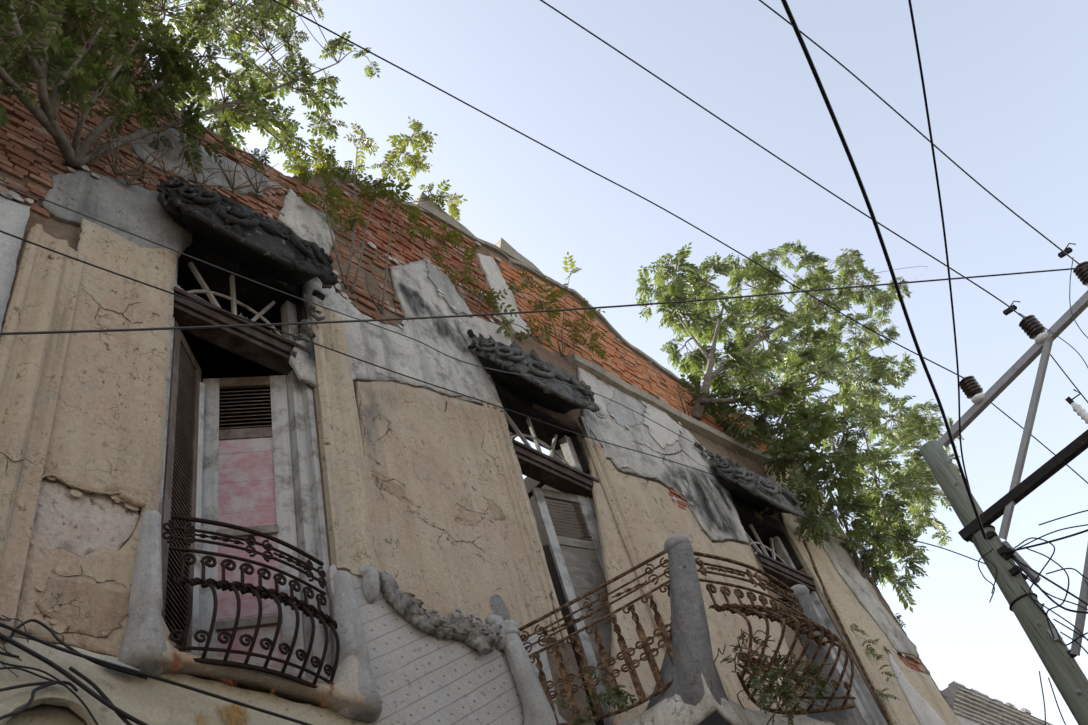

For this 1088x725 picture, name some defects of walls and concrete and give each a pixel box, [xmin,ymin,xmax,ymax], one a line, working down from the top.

spalling [0,33,770,452]
crack [79,282,143,328]
crack [358,372,511,500]
spalling [32,472,149,558]
crack [423,503,484,552]
spalling [34,577,130,638]